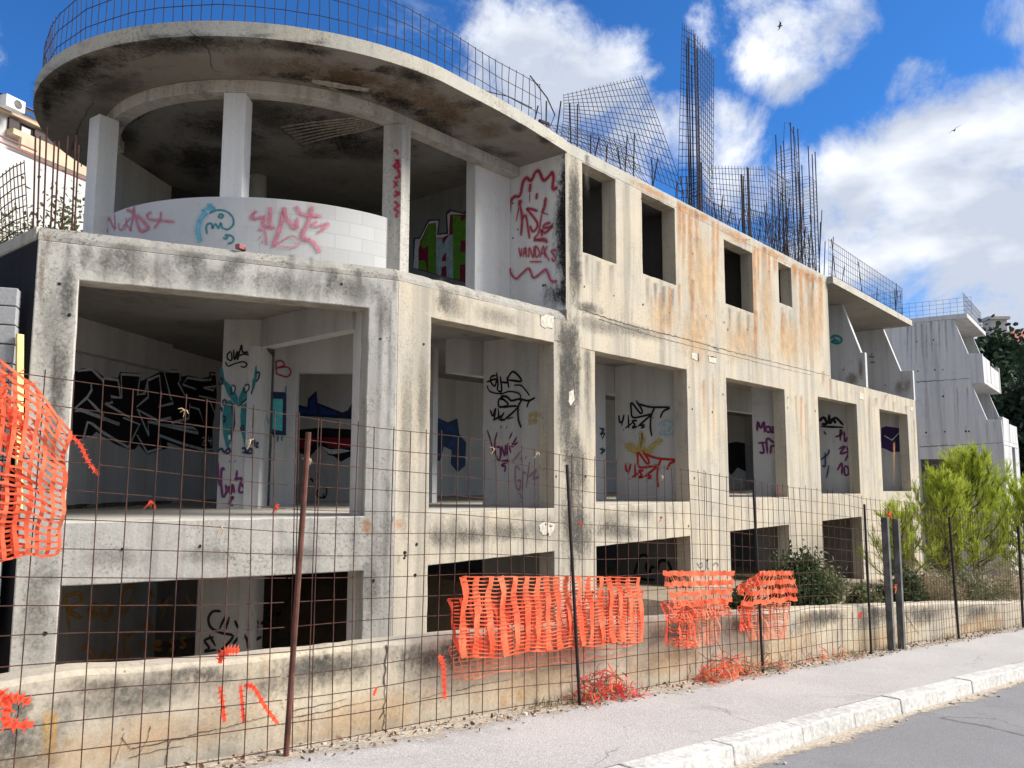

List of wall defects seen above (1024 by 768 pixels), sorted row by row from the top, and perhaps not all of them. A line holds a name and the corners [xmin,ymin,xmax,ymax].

water stain [130,34,242,52]
water stain [263,41,327,53]
water stain [36,59,123,107]
water stain [183,116,223,178]
water stain [552,172,580,304]
water stain [283,655,366,685]